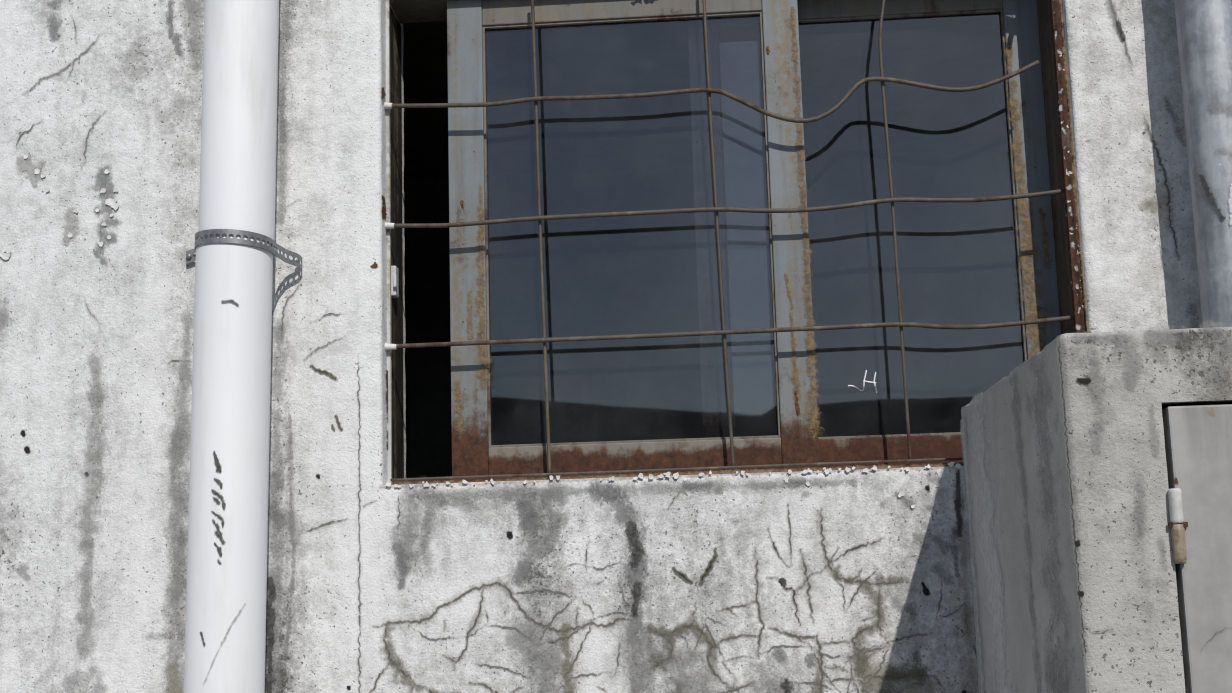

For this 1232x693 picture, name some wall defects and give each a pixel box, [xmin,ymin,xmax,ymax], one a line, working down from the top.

crack [23,19,95,94]
crack [1110,0,1132,63]
crack [1145,122,1179,257]
crack [306,312,634,693]
leakage [510,485,564,586]
crack [653,504,977,693]